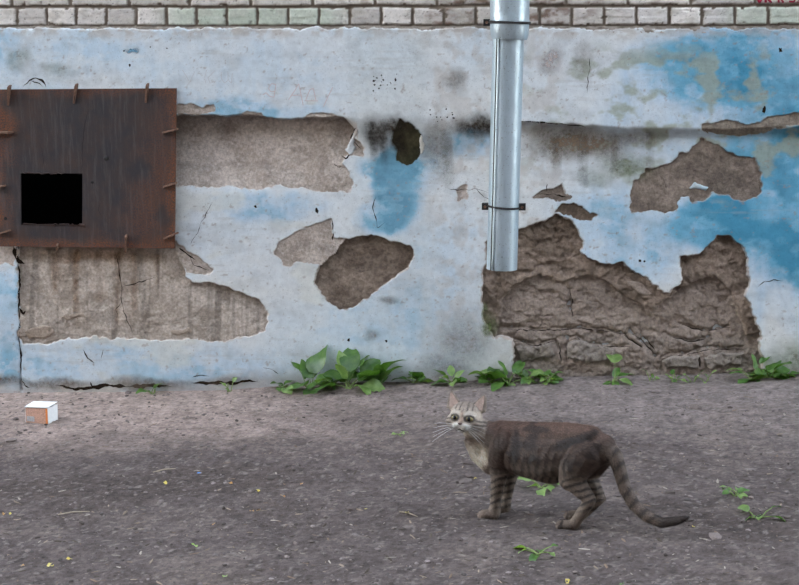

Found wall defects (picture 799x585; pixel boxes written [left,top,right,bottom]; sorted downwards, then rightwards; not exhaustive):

flaking render [176,104,364,193]
peeling [629,106,799,213]
flaking render [0,241,268,344]
flaking render [274,219,414,310]
flaking render [482,185,761,378]